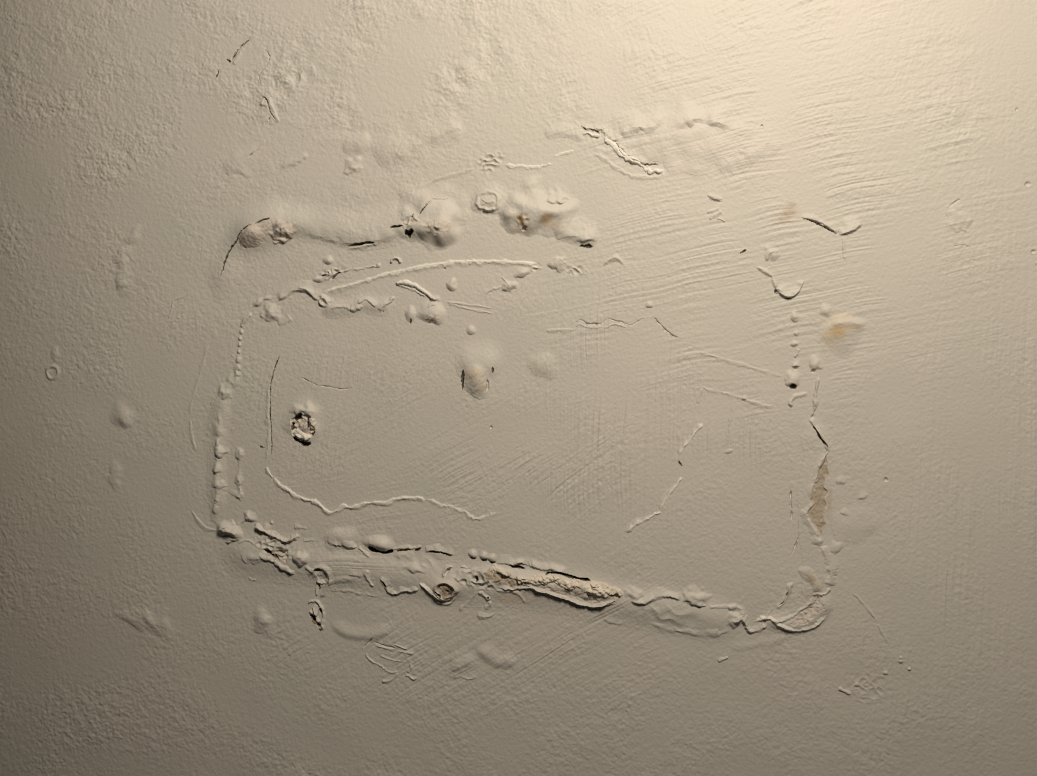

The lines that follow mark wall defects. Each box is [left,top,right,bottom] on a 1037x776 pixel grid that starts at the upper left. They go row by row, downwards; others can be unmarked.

peeling [218,263,381,400]
peeling [350,280,440,313]
peeling [757,246,804,299]
crack [260,358,279,459]
crack [301,377,352,390]
flaking render [785,311,830,538]
peeling [211,413,834,635]